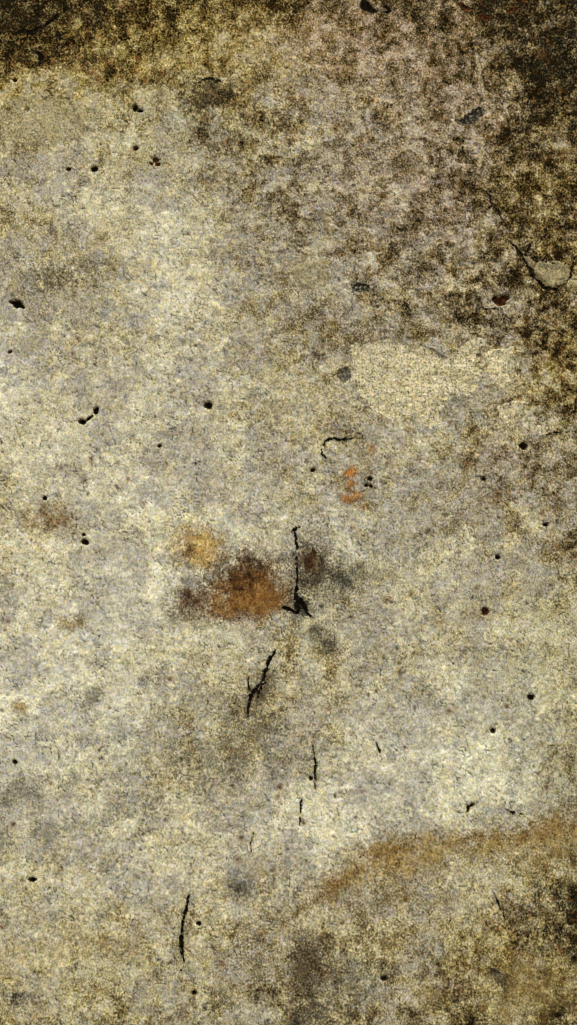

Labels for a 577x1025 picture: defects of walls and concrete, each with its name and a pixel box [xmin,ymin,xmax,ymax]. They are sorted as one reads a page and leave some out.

rust [342,468,364,508]
rust [172,525,330,622]
crack [282,527,314,618]
crack [247,649,276,717]
rust [313,809,577,903]
crack [179,895,190,971]